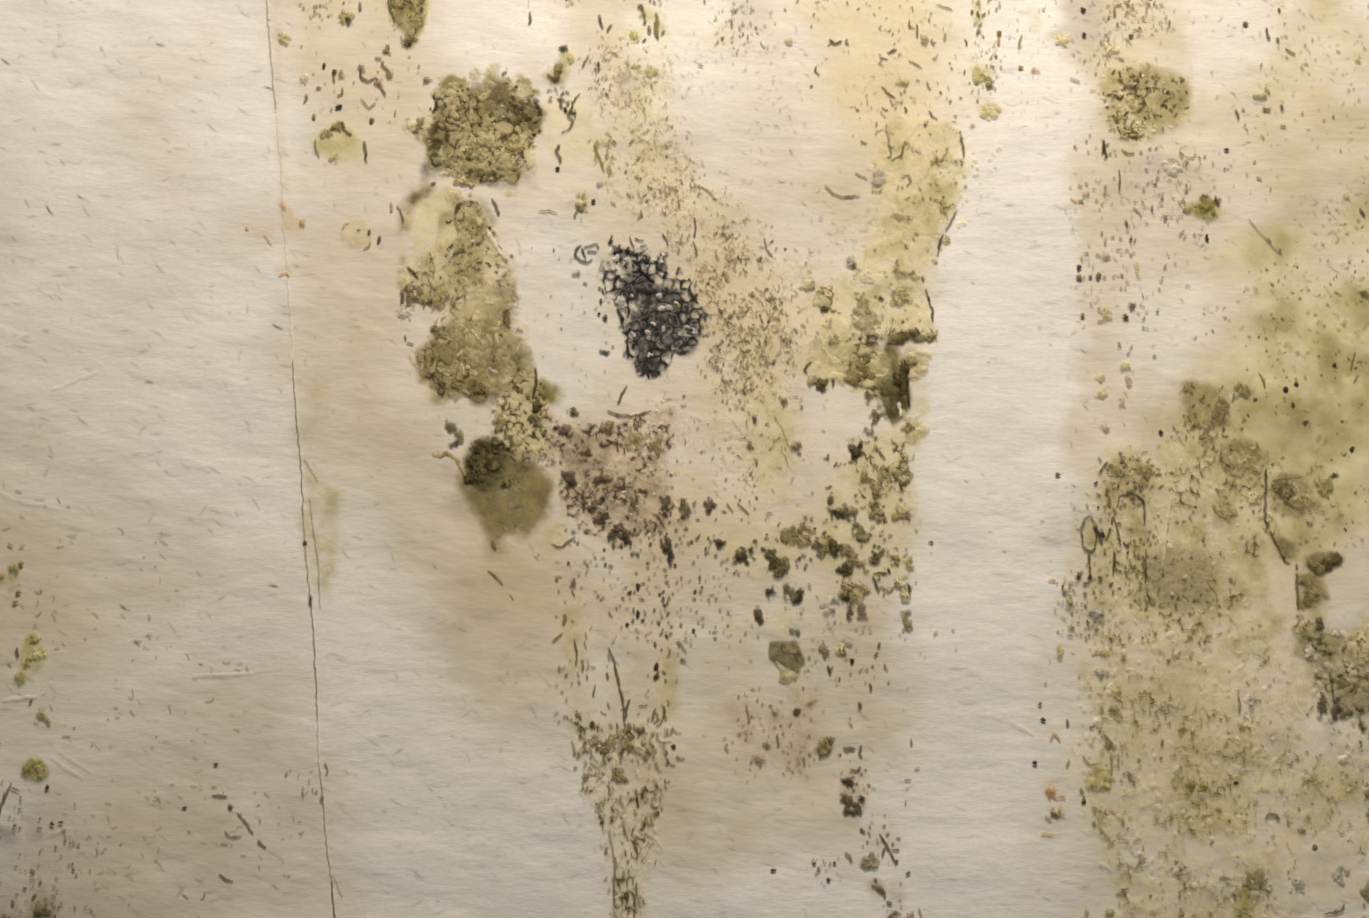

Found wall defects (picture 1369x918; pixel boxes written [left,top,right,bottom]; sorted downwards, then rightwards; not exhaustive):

mould [969,0,1002,127]
mould [1056,0,1229,328]
mould [1235,87,1286,127]
water stain [1248,229,1298,286]
water stain [300,0,936,918]
crack [292,362,334,715]
water stain [1049,275,1369,918]
mould [0,756,49,833]
mould [2,866,63,918]
crack [319,763,336,918]